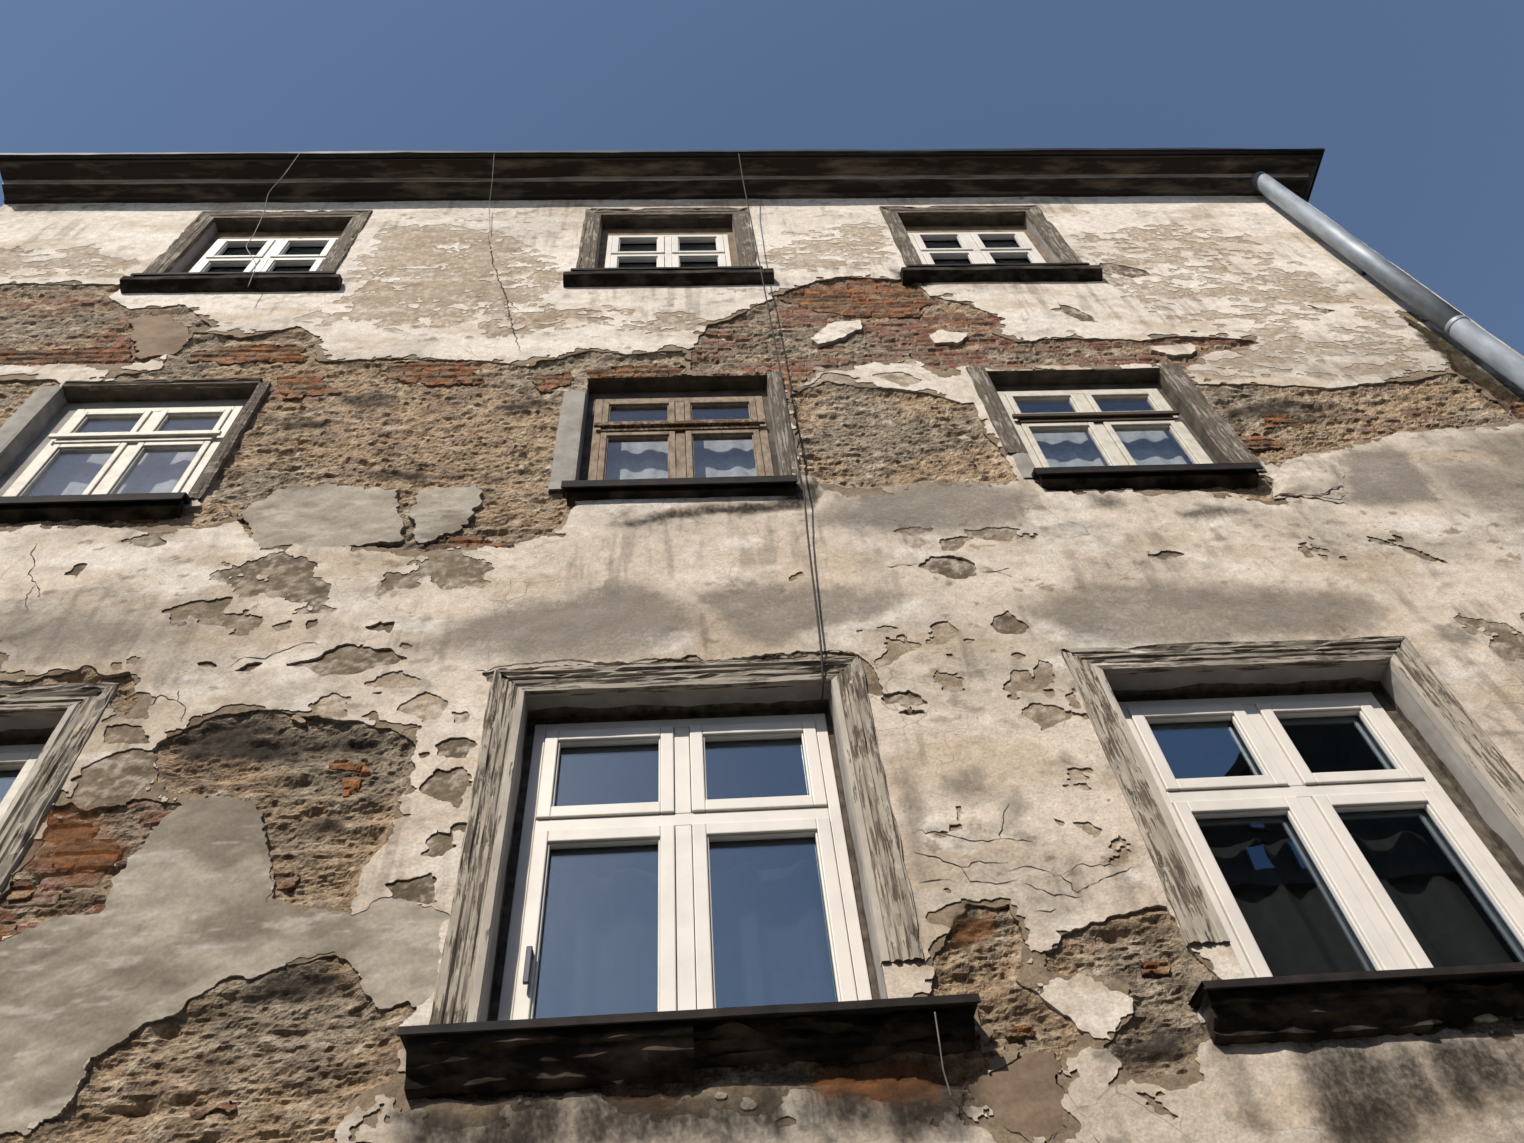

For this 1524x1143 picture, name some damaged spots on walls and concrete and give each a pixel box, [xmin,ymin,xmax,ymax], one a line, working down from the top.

crack [488,235,520,351]
spalling [0,223,1524,636]
water stain [437,585,692,657]
water stain [701,588,898,641]
water stain [1043,584,1370,641]
peeling [1454,613,1524,661]
spalling [0,623,477,942]
crack [915,804,1132,912]
spalling [0,889,1229,1143]